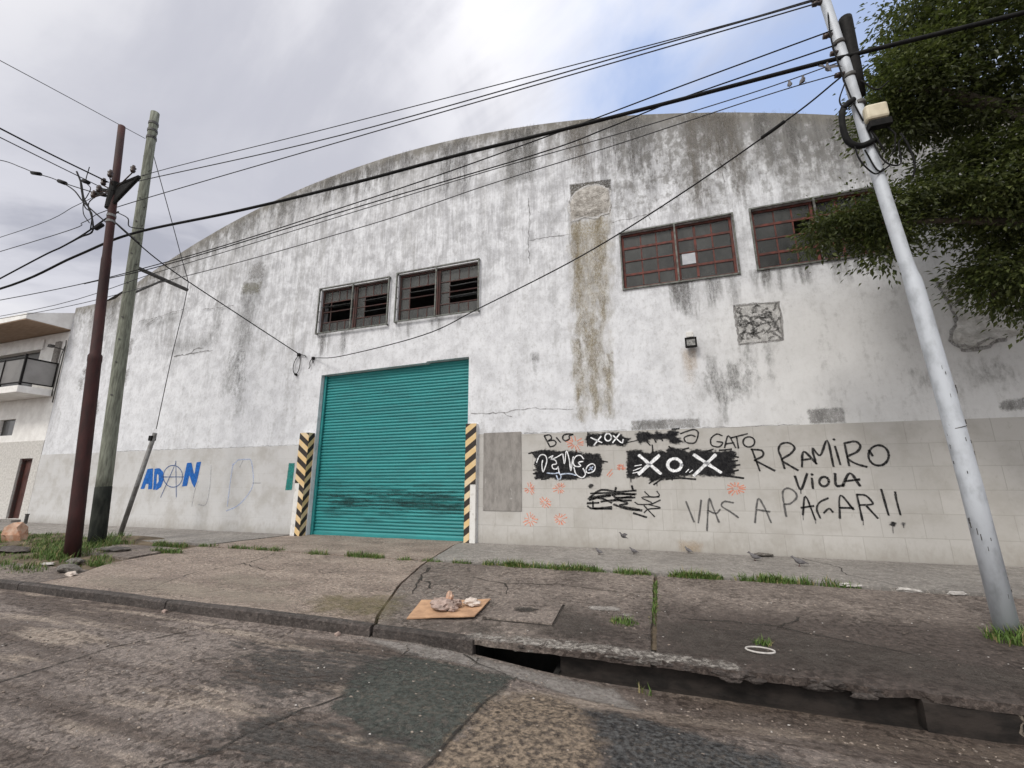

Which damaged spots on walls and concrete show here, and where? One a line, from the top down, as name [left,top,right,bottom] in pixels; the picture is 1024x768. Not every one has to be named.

spalling [567,179,612,221]